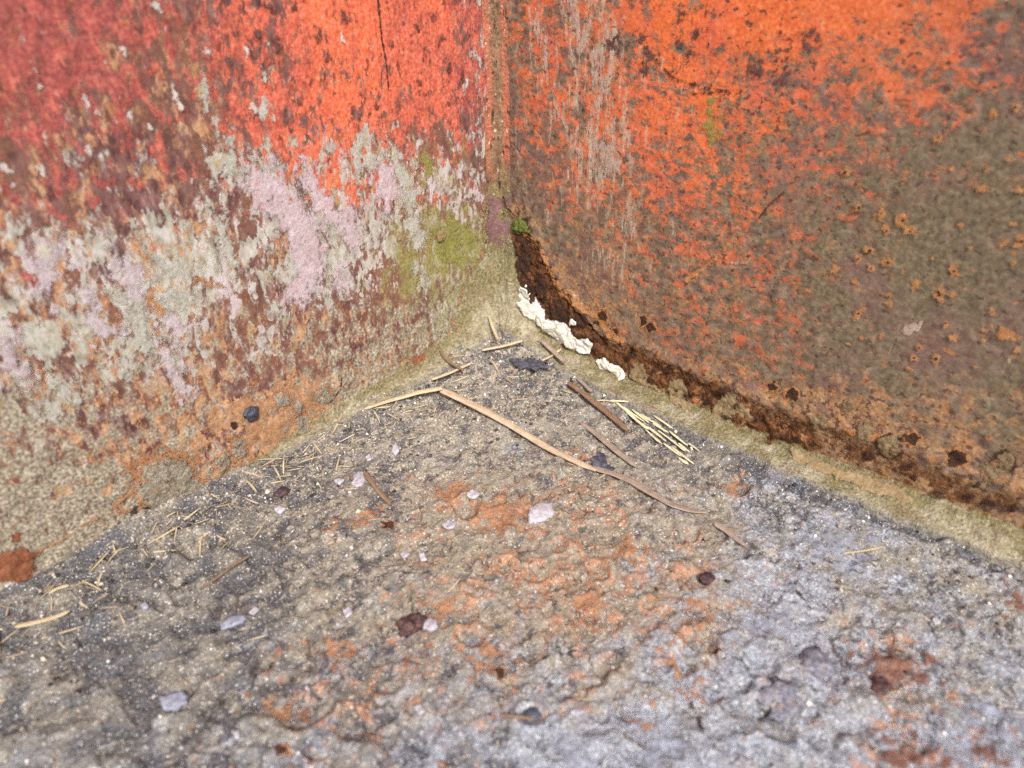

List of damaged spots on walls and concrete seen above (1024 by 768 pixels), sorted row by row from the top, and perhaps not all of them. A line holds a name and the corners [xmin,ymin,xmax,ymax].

corrosion [873,208,917,235]
corrosion [855,246,920,291]
corrosion [932,263,961,304]
corrosion [140,287,165,335]
corrosion [981,308,1022,353]
corrosion [110,376,337,509]
corrosion [538,442,594,481]
corrosion [608,335,1024,516]
corrosion [321,503,387,541]
corrosion [432,472,535,542]
corrosion [0,532,40,584]